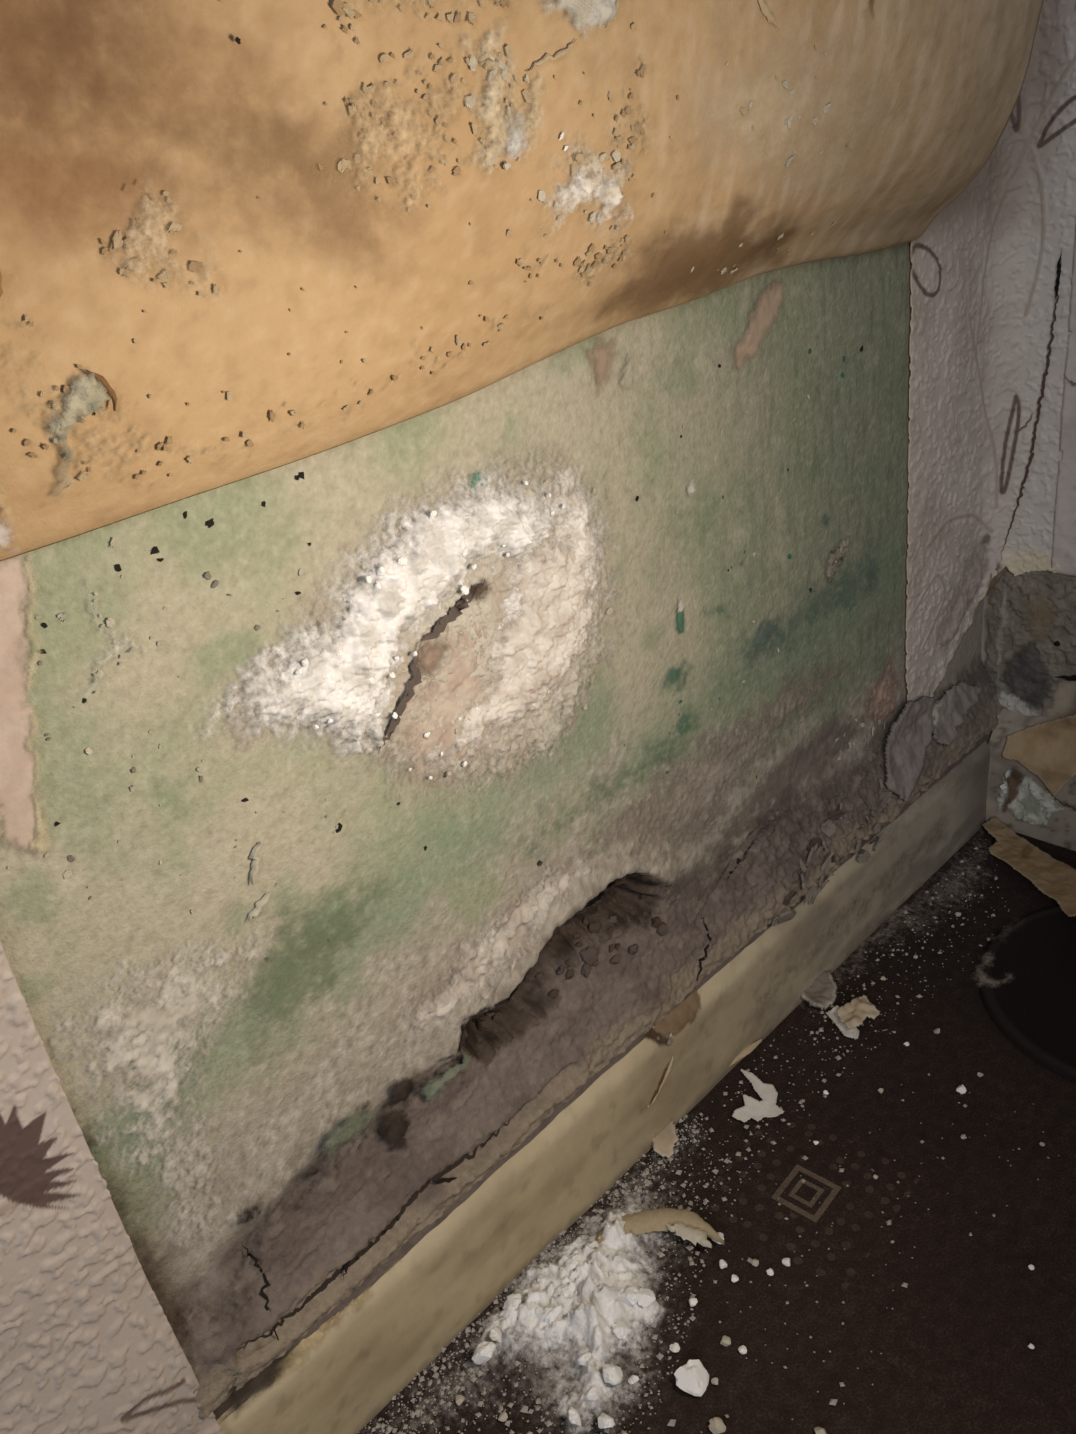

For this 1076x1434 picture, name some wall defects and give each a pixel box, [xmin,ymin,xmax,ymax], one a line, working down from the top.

spalling [412,0,620,149]
peeling [559,93,645,196]
spalling [12,364,118,494]
peeling [734,282,784,370]
crack [998,247,1076,564]
water stain [213,452,622,793]
water stain [595,664,858,899]
water stain [50,910,358,1256]
water stain [402,859,591,1041]
spalling [176,570,1076,1418]
crack [238,1119,511,1350]
water stain [218,1351,289,1411]